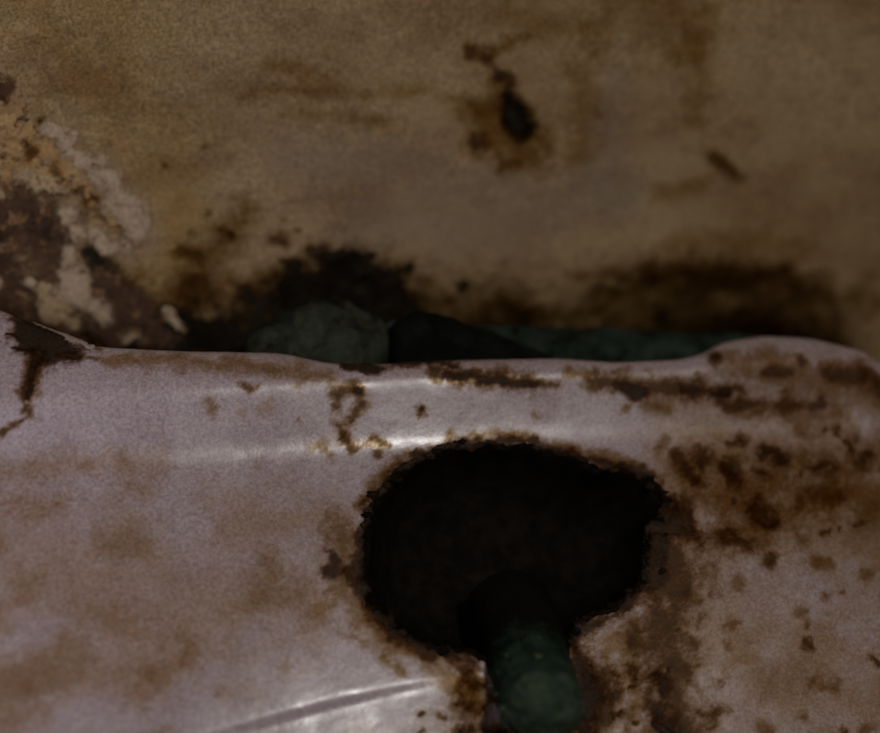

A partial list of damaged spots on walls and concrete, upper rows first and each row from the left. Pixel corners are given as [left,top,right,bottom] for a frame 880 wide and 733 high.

flaking render [0,100,239,367]
mould [122,244,420,353]
crack [0,333,41,436]
corrosion [331,360,555,453]
corrosion [587,370,758,412]
corrosion [757,444,789,475]
corrosion [322,434,702,733]